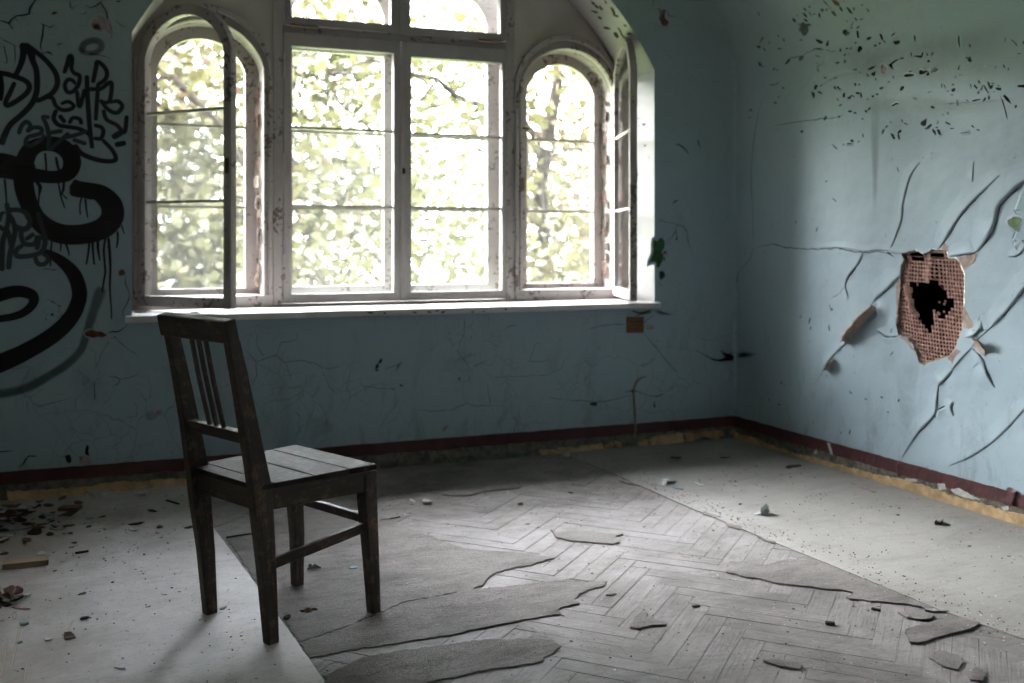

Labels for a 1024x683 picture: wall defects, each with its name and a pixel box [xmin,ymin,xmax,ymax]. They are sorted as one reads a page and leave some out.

peeling [756,0,938,140]
peeling [914,33,1001,138]
crack [756,159,920,376]
spalling [896,243,978,366]
crack [900,161,1024,466]
peeling [937,483,979,500]